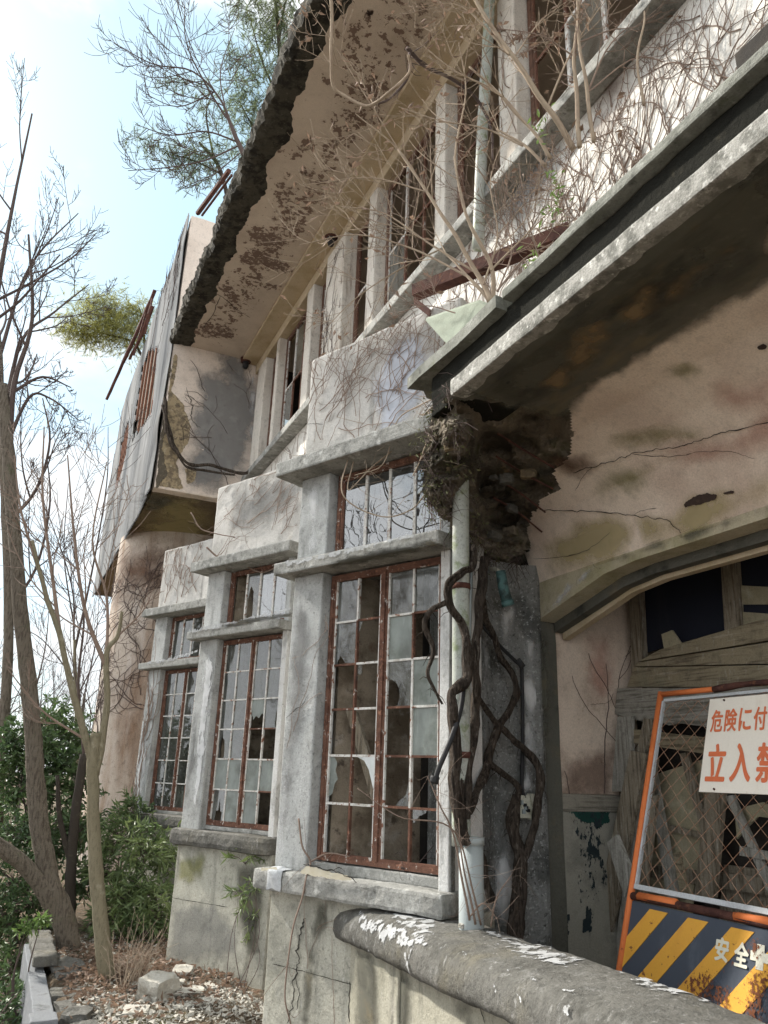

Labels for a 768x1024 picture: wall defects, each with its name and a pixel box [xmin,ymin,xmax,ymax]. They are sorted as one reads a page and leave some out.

peeling [194,0,438,346]
spalling [397,372,576,588]
crack [539,422,768,569]
peeling [684,491,734,508]
peeling [569,812,610,933]
crack [273,919,351,1023]